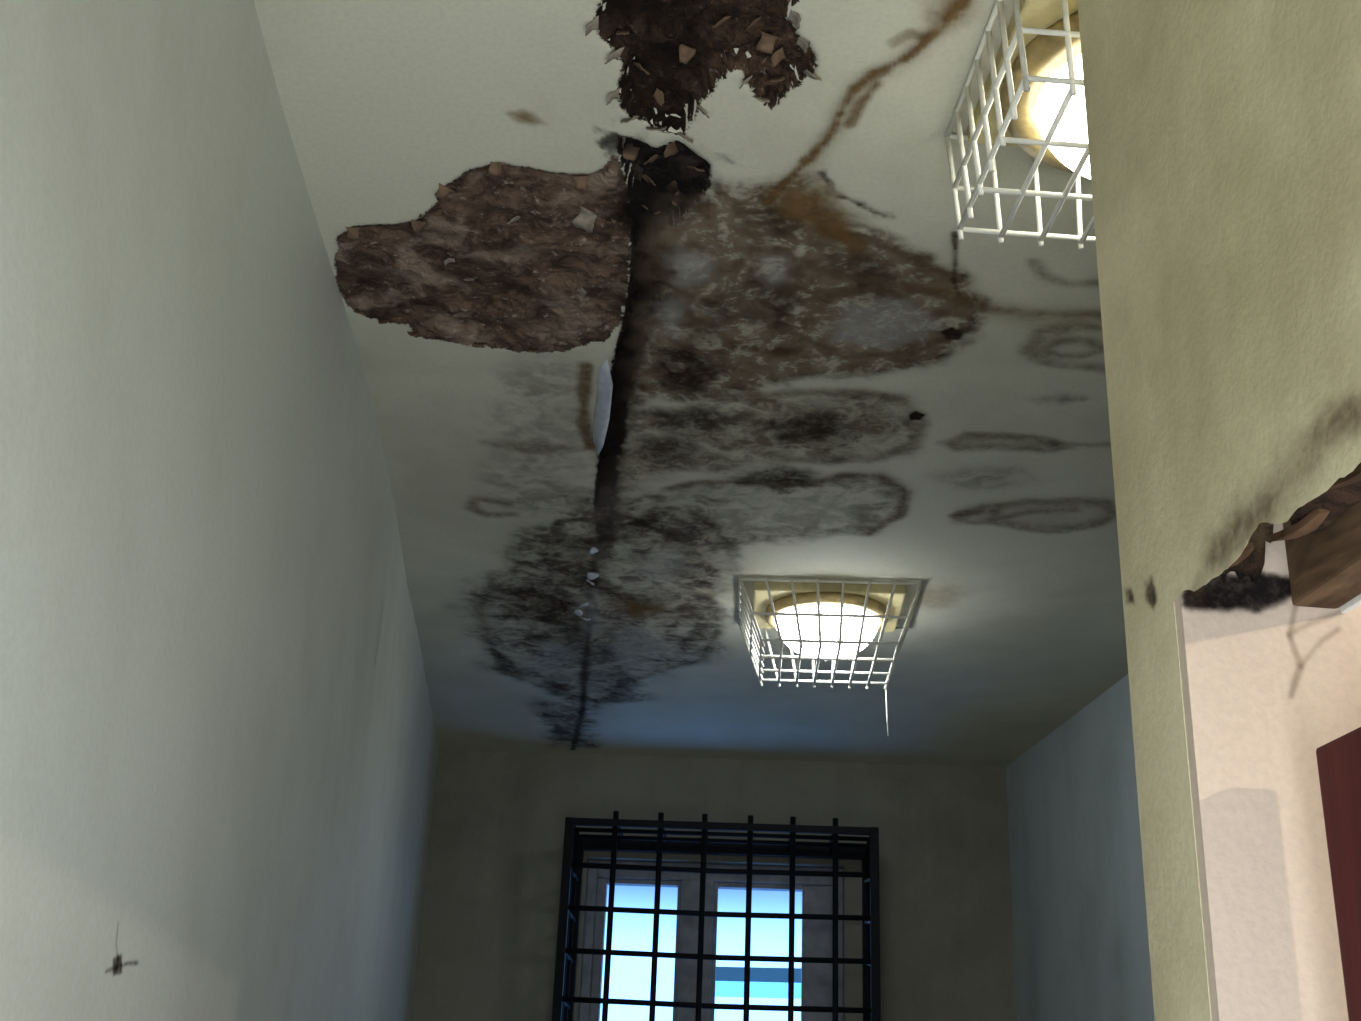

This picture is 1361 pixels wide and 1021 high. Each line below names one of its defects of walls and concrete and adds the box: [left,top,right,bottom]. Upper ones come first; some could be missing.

flaking render [585,0,822,144]
flaking render [333,154,633,354]
peeling [578,359,613,455]
crack [551,133,712,750]
water stain [471,180,984,747]